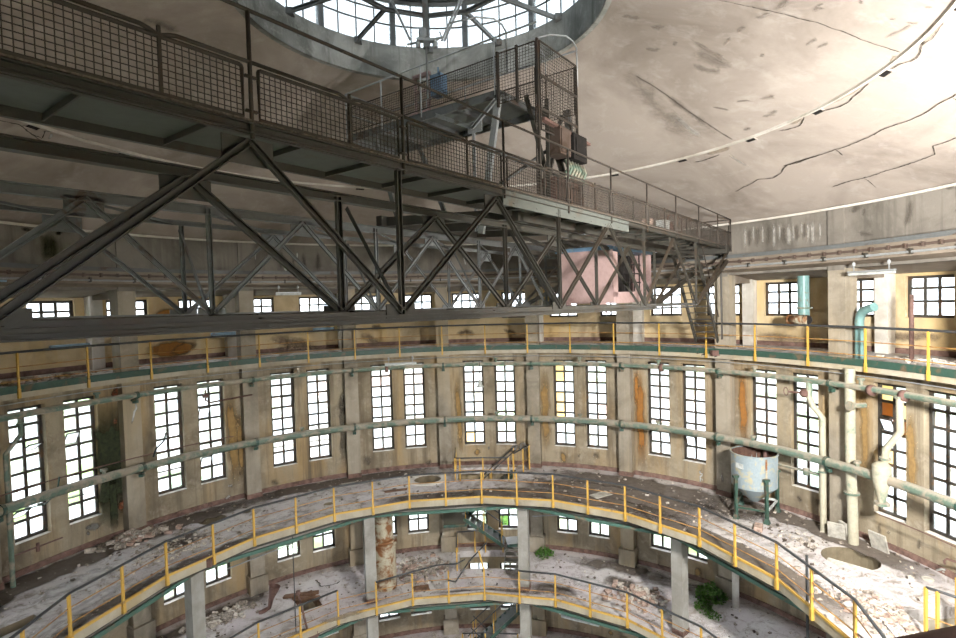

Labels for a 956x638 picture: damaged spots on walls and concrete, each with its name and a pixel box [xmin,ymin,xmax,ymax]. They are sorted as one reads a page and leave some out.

crack [720,0,943,69]
crack [636,76,731,162]
crack [781,84,868,131]
crack [735,95,956,192]
leakage [744,225,821,243]
leakage [93,412,123,523]
rust [226,403,244,472]
rust [634,375,645,451]
rust [739,379,747,431]